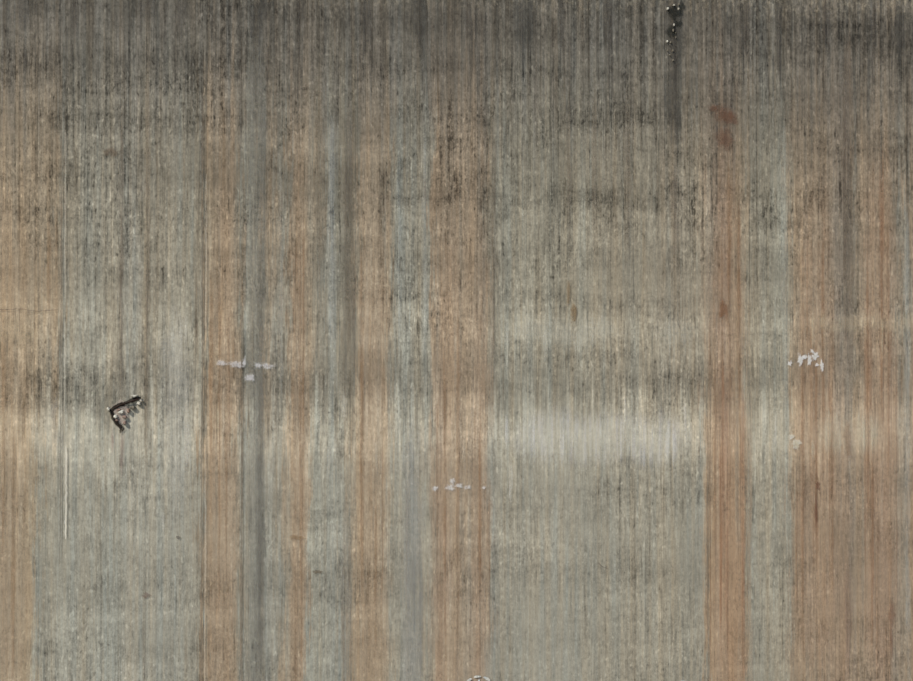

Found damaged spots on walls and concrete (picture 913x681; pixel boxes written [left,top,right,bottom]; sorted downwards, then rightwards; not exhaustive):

leakage [667,0,685,36]
spalling [107,395,143,432]